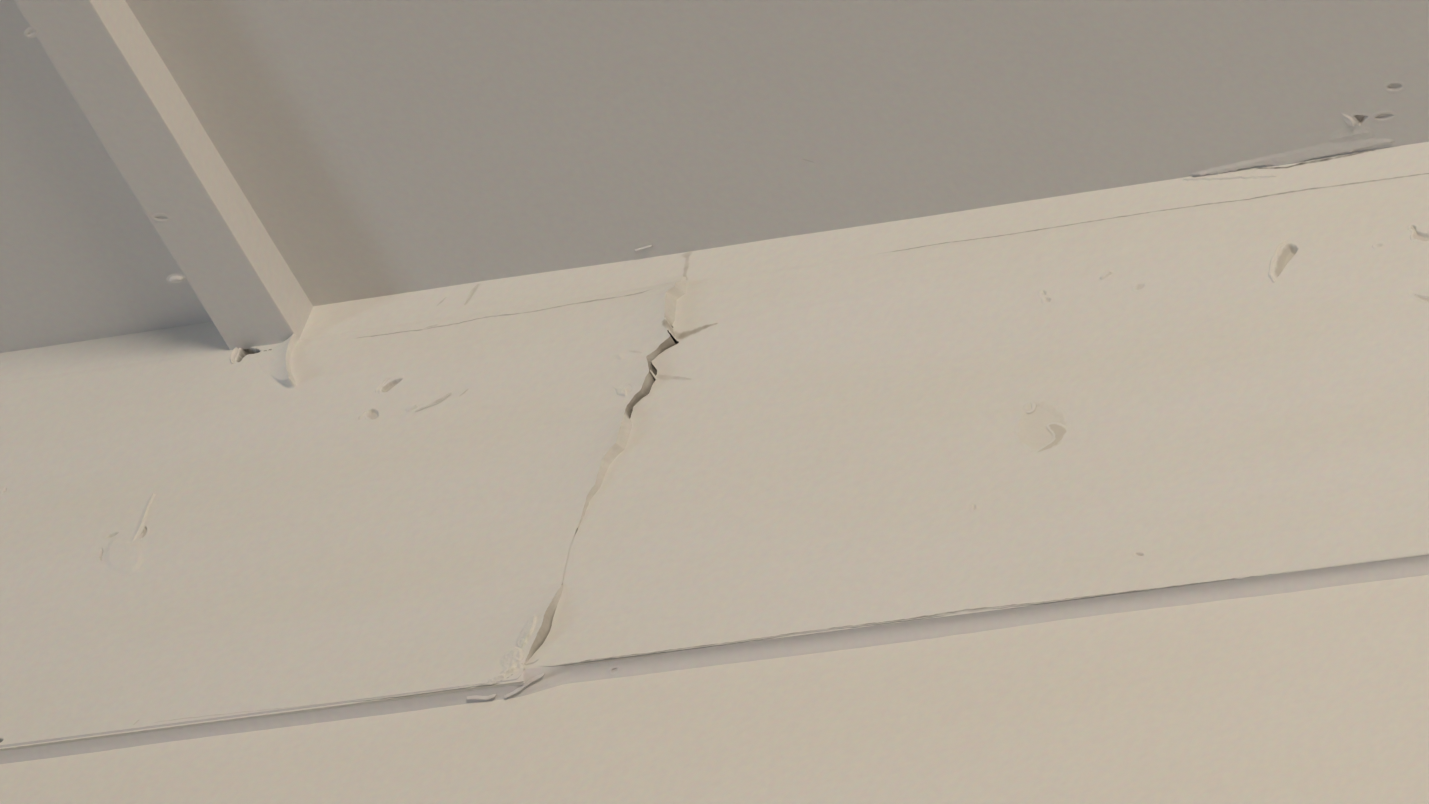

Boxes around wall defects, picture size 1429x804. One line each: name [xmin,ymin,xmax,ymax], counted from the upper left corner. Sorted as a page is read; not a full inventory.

spalling [1268,240,1302,283]
peeling [230,346,272,364]
crack [352,251,719,528]